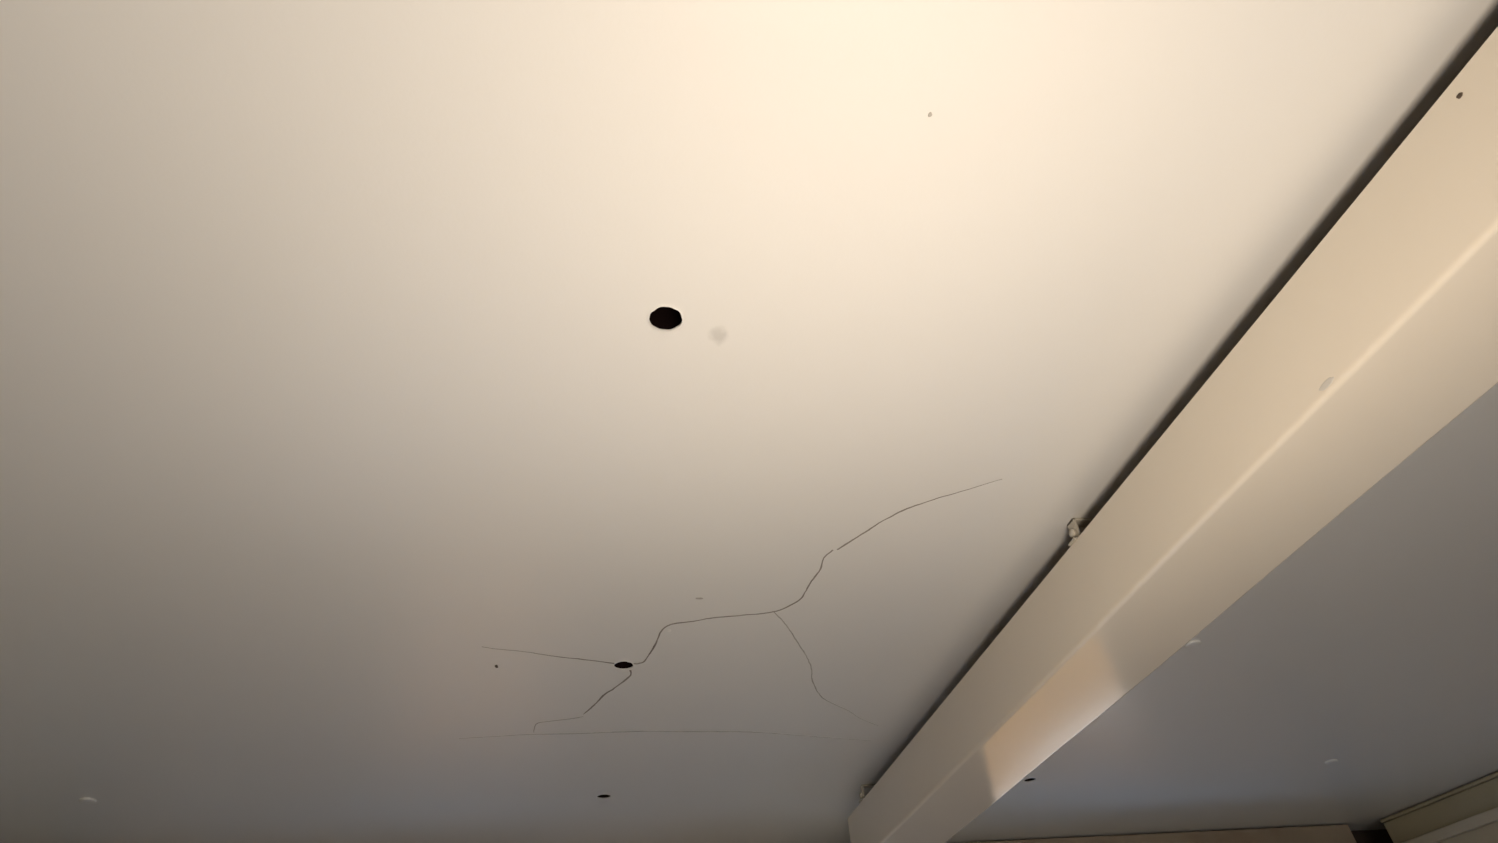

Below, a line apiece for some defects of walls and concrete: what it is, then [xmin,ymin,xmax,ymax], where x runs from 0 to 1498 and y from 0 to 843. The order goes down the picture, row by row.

crack [459,479,1002,741]